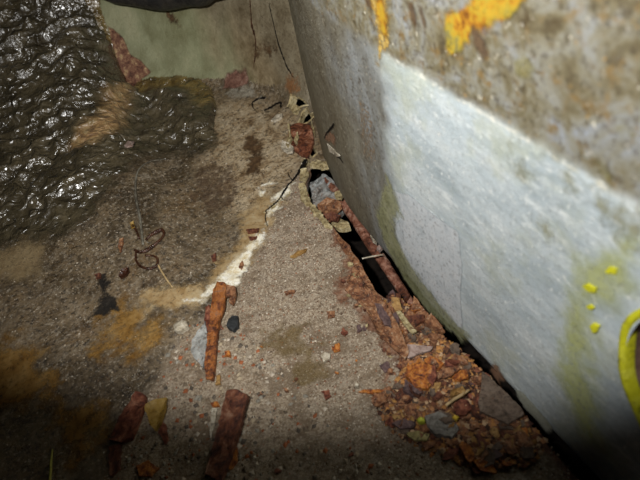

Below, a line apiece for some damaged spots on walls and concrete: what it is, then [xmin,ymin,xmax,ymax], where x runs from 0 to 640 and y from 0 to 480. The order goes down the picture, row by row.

crack [248,0,256,67]
crack [269,5,294,78]
crack [263,159,308,225]
spalling [271,93,333,230]
rust [323,211,341,223]
crack [324,124,343,163]
water stain [88,182,296,363]
rust [203,281,237,382]
rust [331,236,504,442]
rust [459,420,528,474]